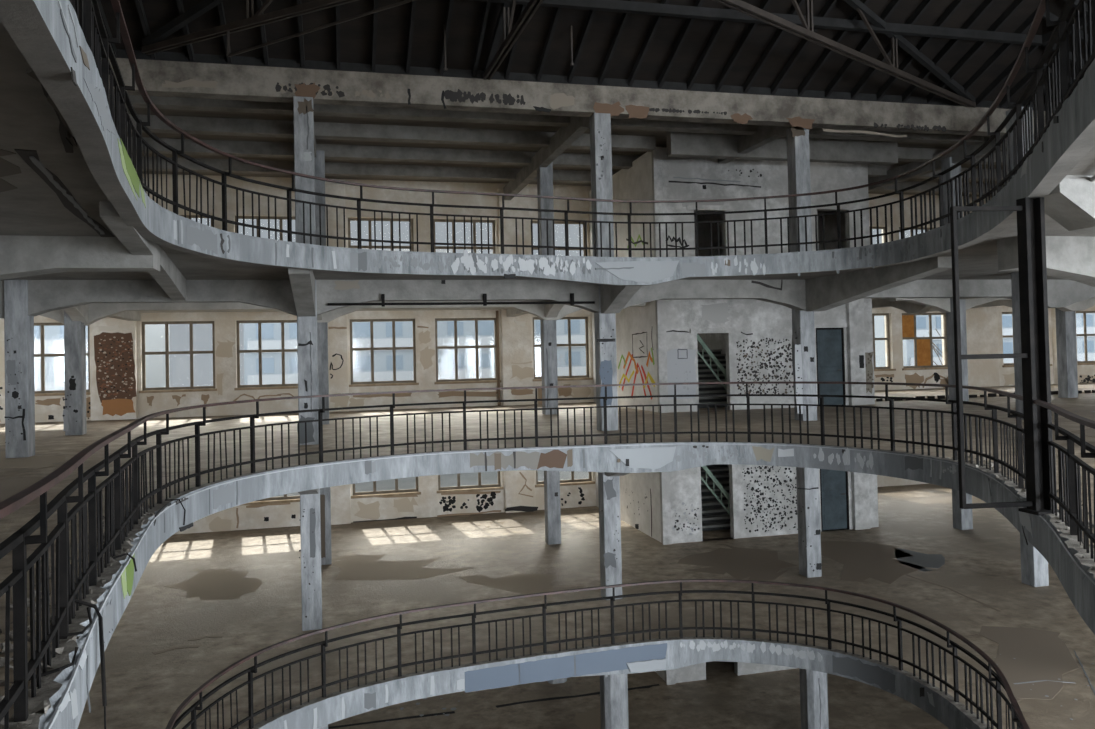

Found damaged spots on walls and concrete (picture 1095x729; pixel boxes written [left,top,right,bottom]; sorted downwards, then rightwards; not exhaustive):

water stain [164,568,263,601]